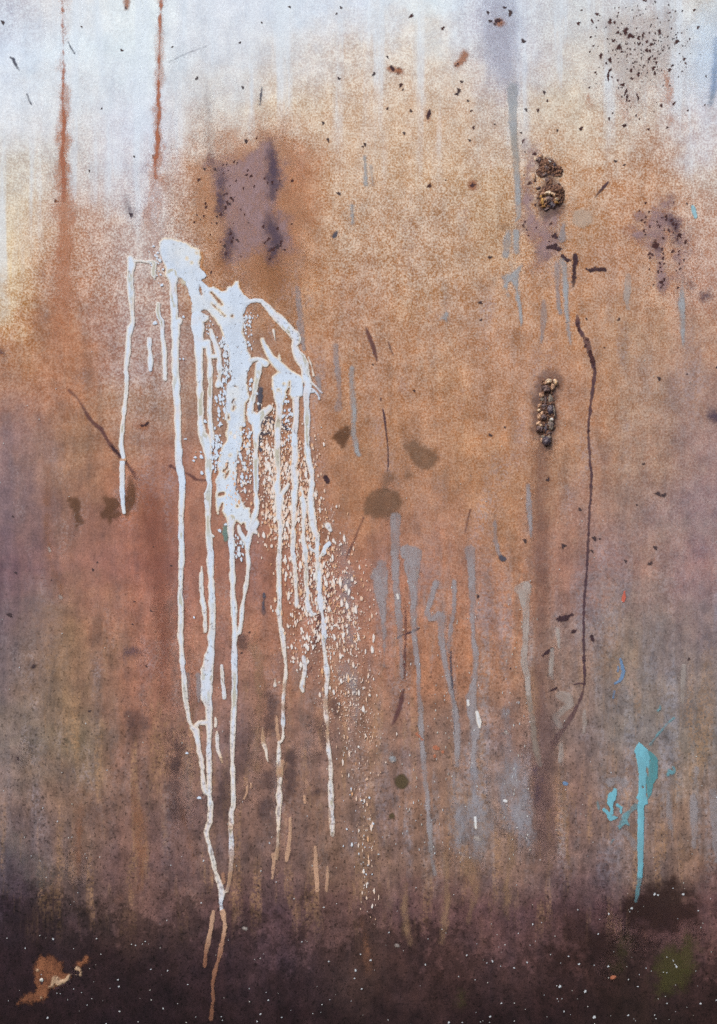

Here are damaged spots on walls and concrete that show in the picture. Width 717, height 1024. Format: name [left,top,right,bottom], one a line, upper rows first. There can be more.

corrosion [577,0,701,130]
corrosion [54,68,75,276]
corrosion [152,80,161,179]
corrosion [190,132,304,282]
corrosion [522,151,562,258]
corrosion [632,200,688,289]
water stain [624,879,697,932]